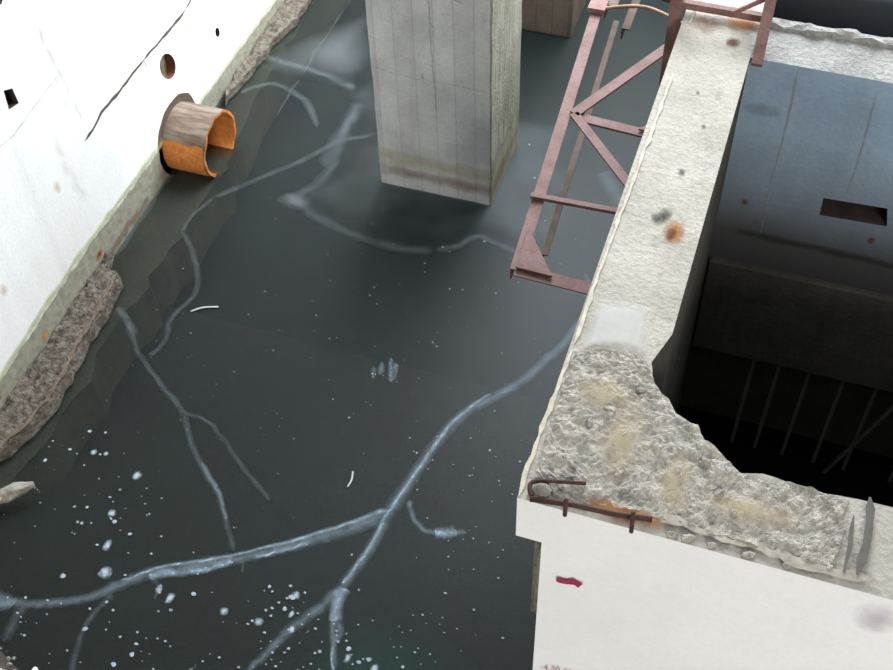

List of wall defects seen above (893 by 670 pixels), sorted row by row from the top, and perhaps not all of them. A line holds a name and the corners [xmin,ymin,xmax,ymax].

crack [85,0,191,141]
spalling [518,72,887,584]
corrosion [592,502,655,525]